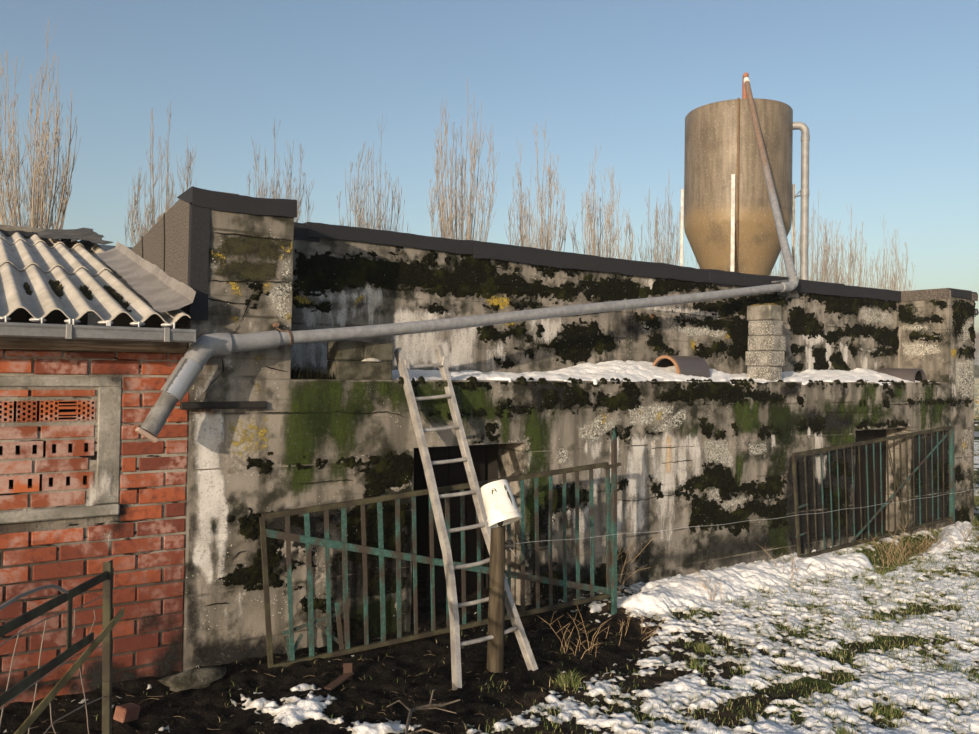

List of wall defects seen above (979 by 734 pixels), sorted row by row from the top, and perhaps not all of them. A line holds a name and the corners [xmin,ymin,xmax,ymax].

damp [304,285,382,327]
damp [188,412,229,584]
damp [533,432,776,566]
damp [530,558,590,606]